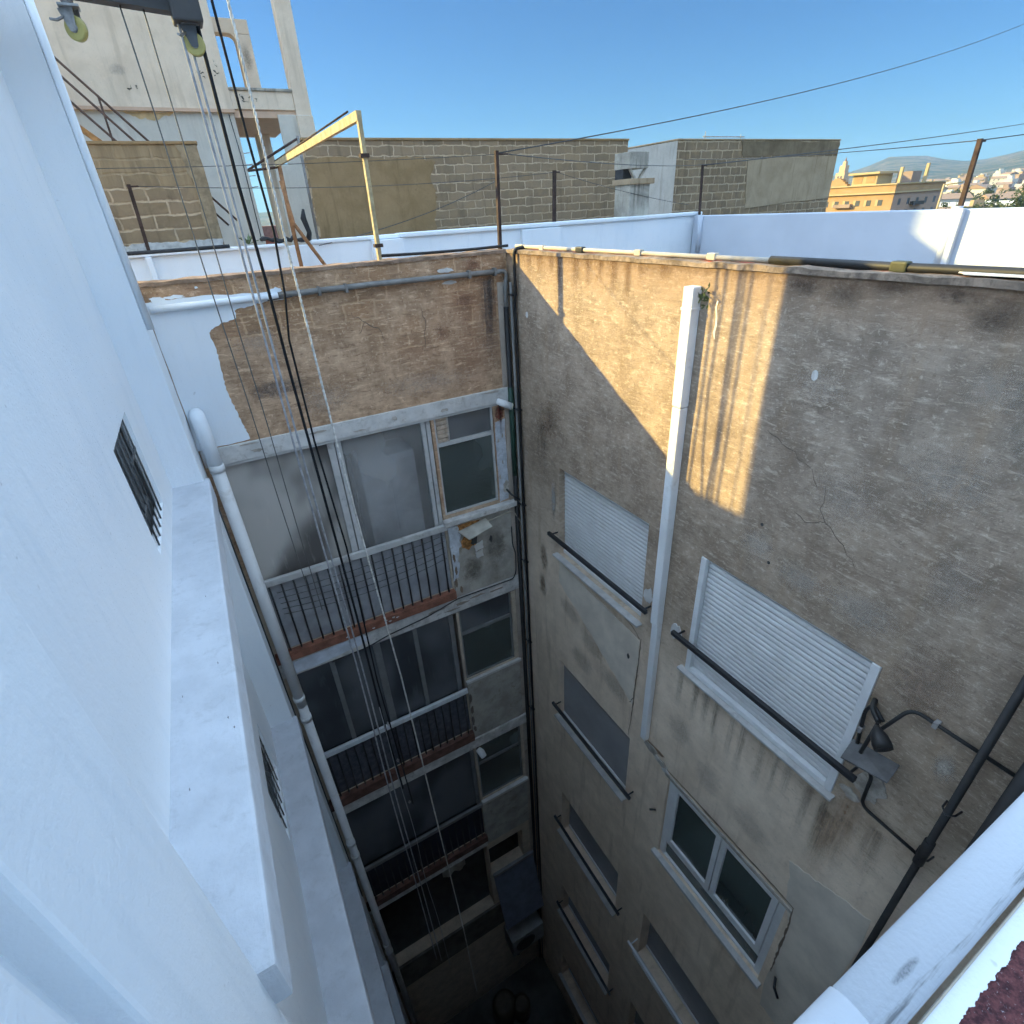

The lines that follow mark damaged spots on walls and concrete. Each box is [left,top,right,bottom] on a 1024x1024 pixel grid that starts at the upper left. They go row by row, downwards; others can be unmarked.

crack [771,434,854,566]